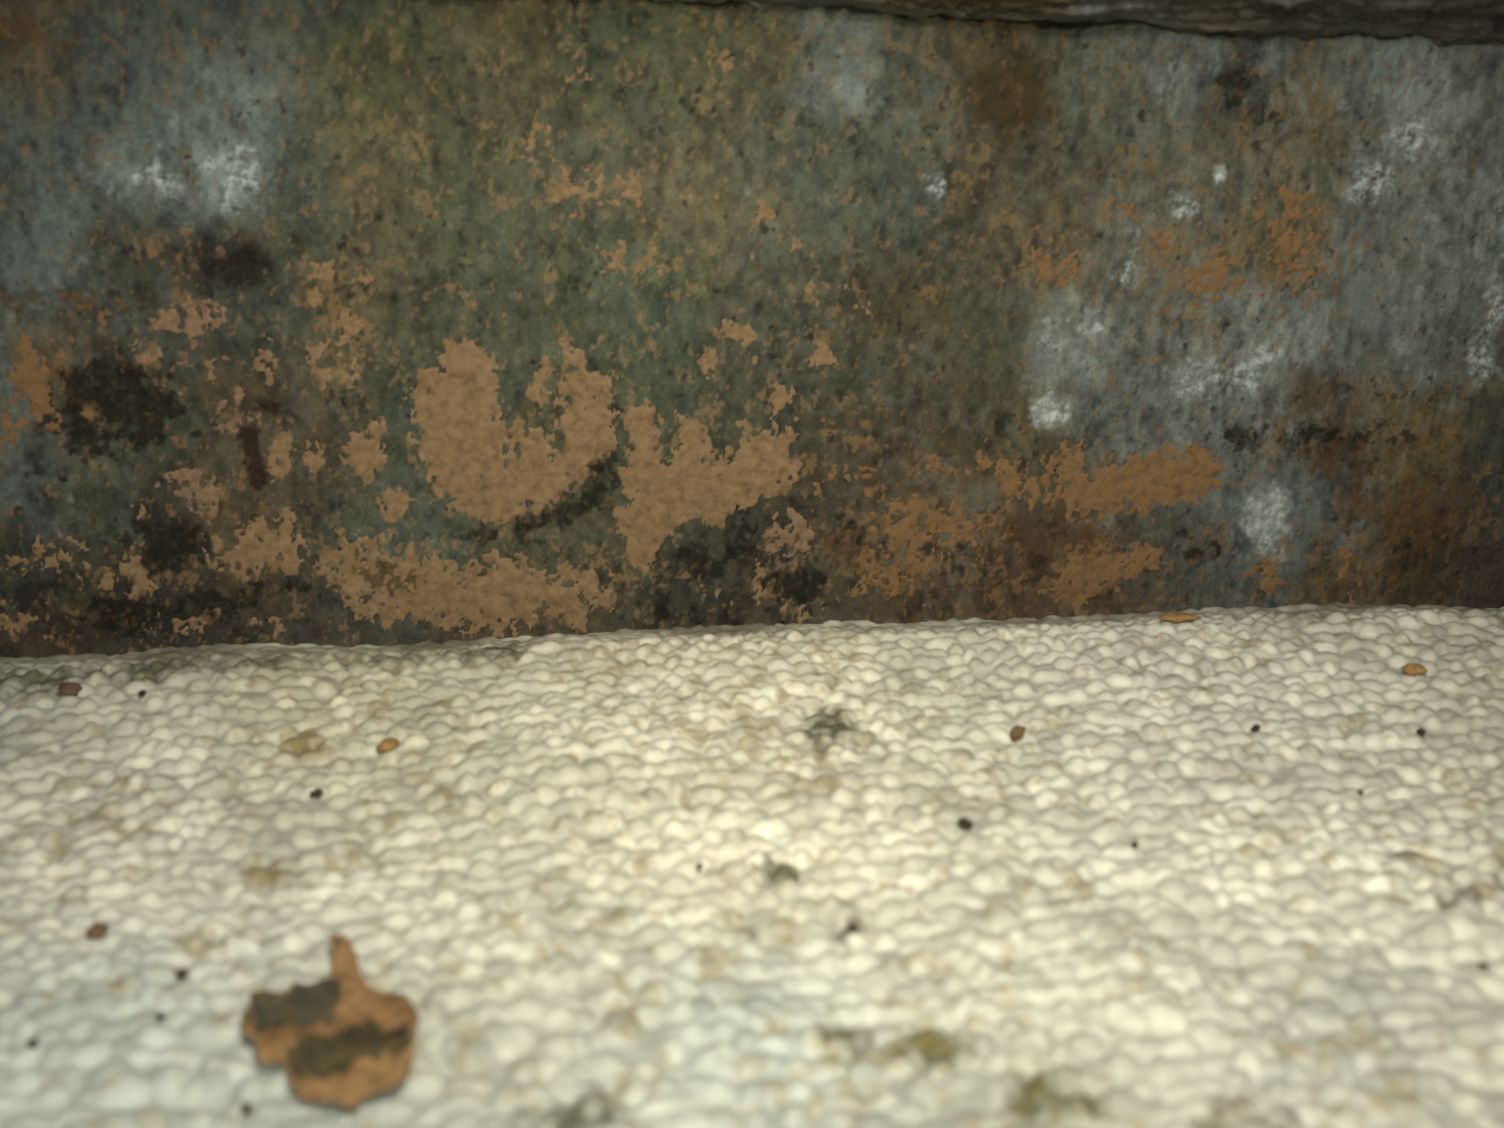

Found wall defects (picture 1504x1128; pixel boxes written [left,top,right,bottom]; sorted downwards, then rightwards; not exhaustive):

efflorescence [199,145,259,211]
efflorescence [1347,162,1394,200]
peeling [0,333,70,444]
mould [50,347,186,463]
peeling [129,295,230,396]
peeling [696,318,758,380]
damp [1032,392,1069,427]
efflorescence [1177,342,1285,399]
mould [460,458,617,540]
peeling [154,336,1225,640]
peeling [0,596,54,642]
peeling [5,531,221,635]